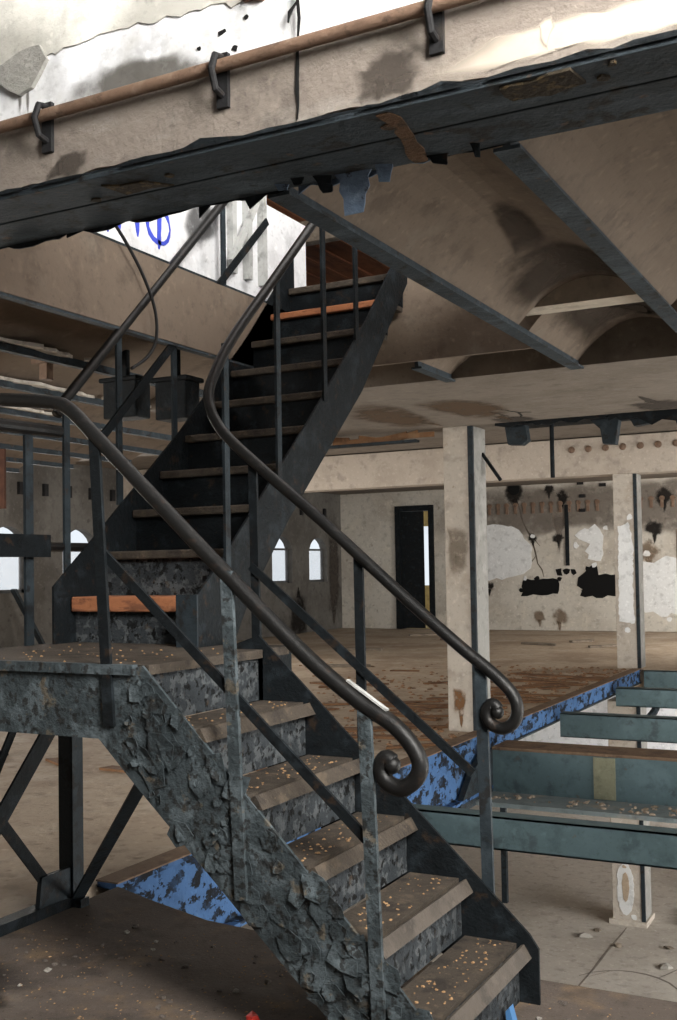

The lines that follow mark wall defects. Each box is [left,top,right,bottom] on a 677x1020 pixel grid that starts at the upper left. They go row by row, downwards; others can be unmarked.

peeling [0,0,264,65]
spalling [0,29,677,195]
leakage [361,52,414,99]
rust [376,112,428,163]
peeling [0,164,393,249]
peeling [487,514,677,633]